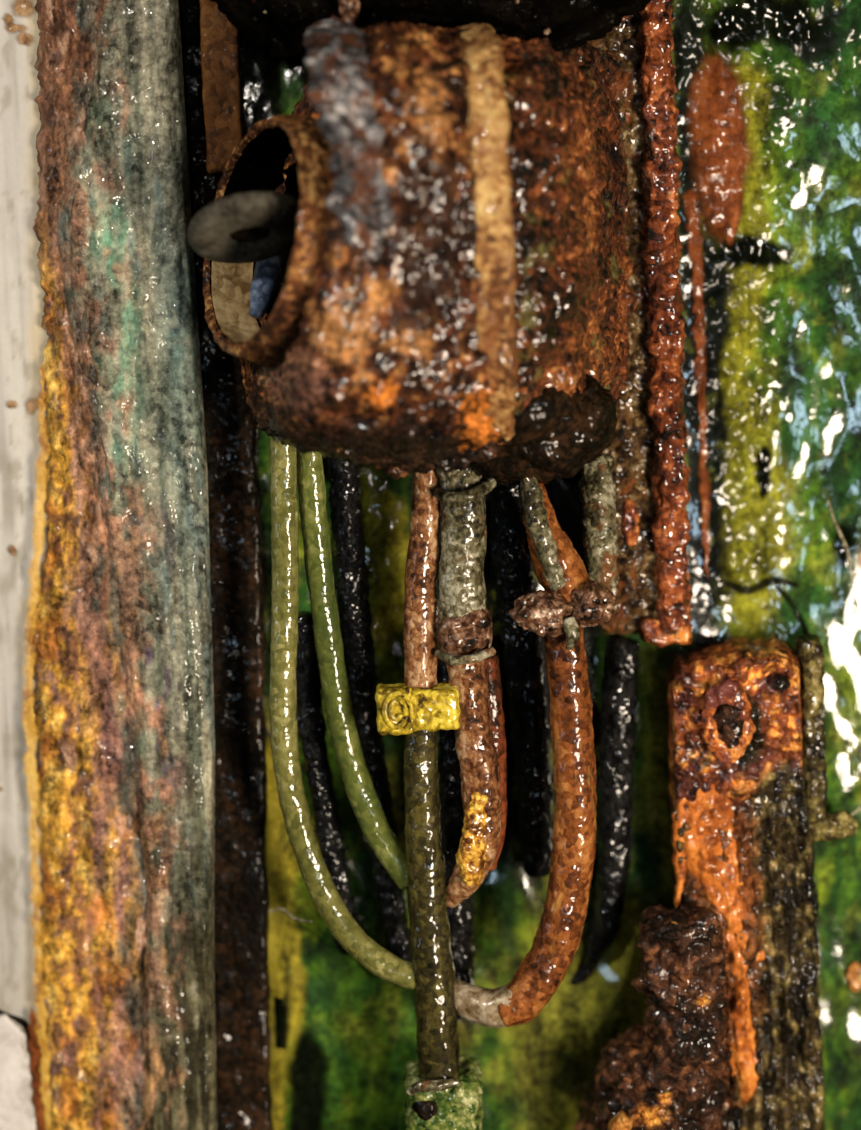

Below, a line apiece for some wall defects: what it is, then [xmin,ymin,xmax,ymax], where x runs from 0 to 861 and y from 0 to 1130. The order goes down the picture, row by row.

water stain [708,0,827,51]
water stain [720,235,791,268]
rust [683,54,749,578]
water stain [756,446,772,500]
rust [3,0,147,1130]
rust [455,792,488,887]
rust [672,784,766,1103]
rust [608,1093,672,1130]